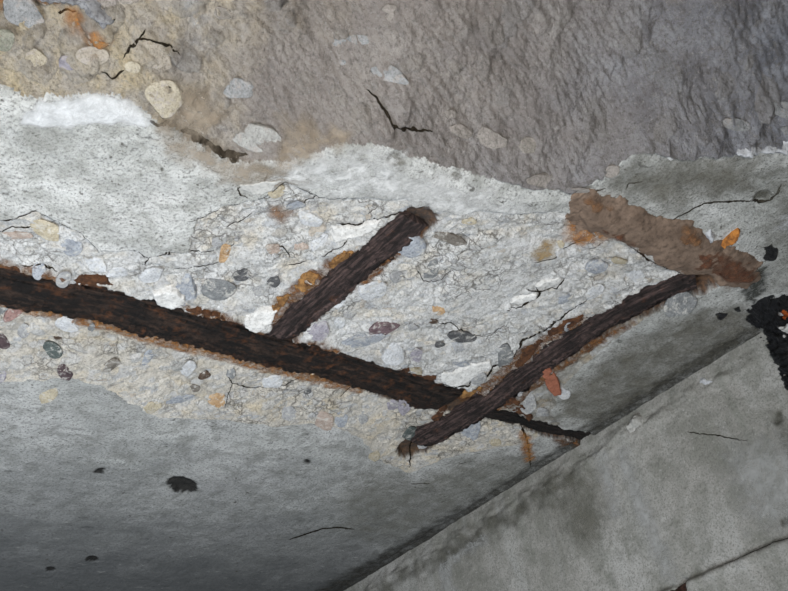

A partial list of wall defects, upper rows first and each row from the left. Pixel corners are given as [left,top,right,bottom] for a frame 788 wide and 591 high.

crack [101,29,180,80]
crack [367,89,433,132]
spalling [0,180,698,473]
rust [0,188,763,462]